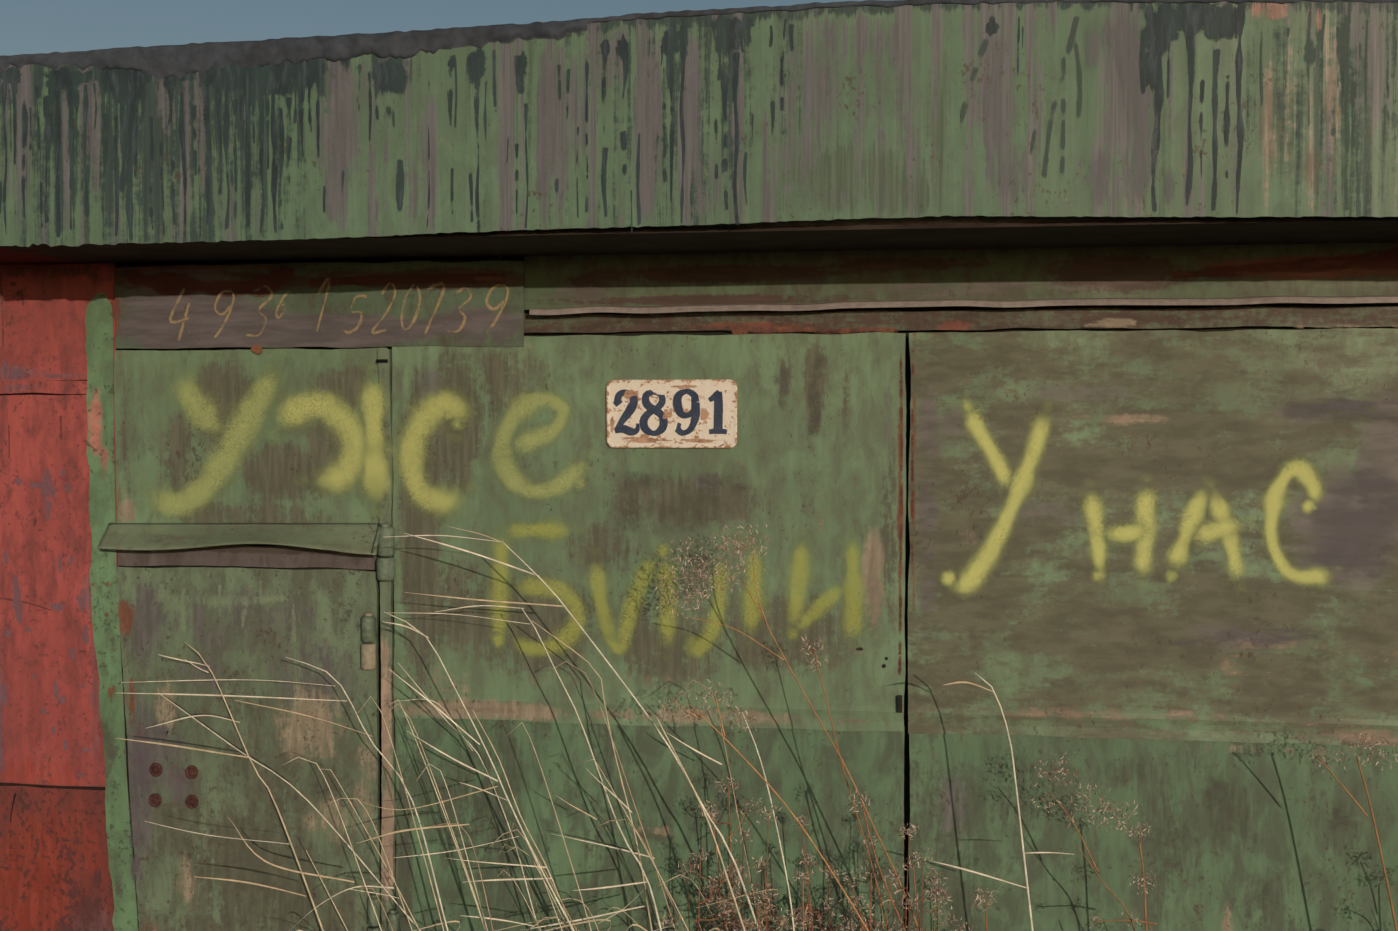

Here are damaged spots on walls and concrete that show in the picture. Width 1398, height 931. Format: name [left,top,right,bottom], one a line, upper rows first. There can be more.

peeling [60,93,69,230]
peeling [684,35,708,220]
rust [107,678,203,891]